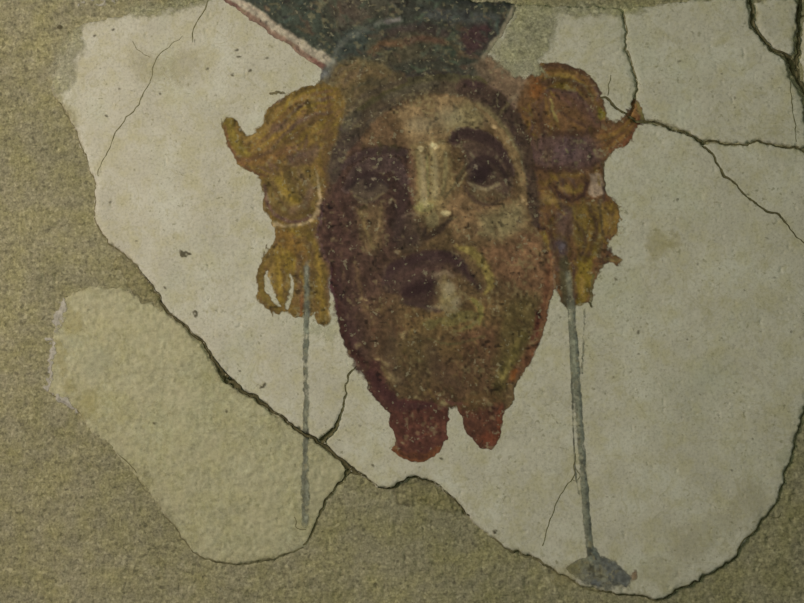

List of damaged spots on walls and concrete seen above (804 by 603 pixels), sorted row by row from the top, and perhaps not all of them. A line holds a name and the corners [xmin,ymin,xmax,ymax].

crack [58,0,469,565]
crack [587,0,804,243]